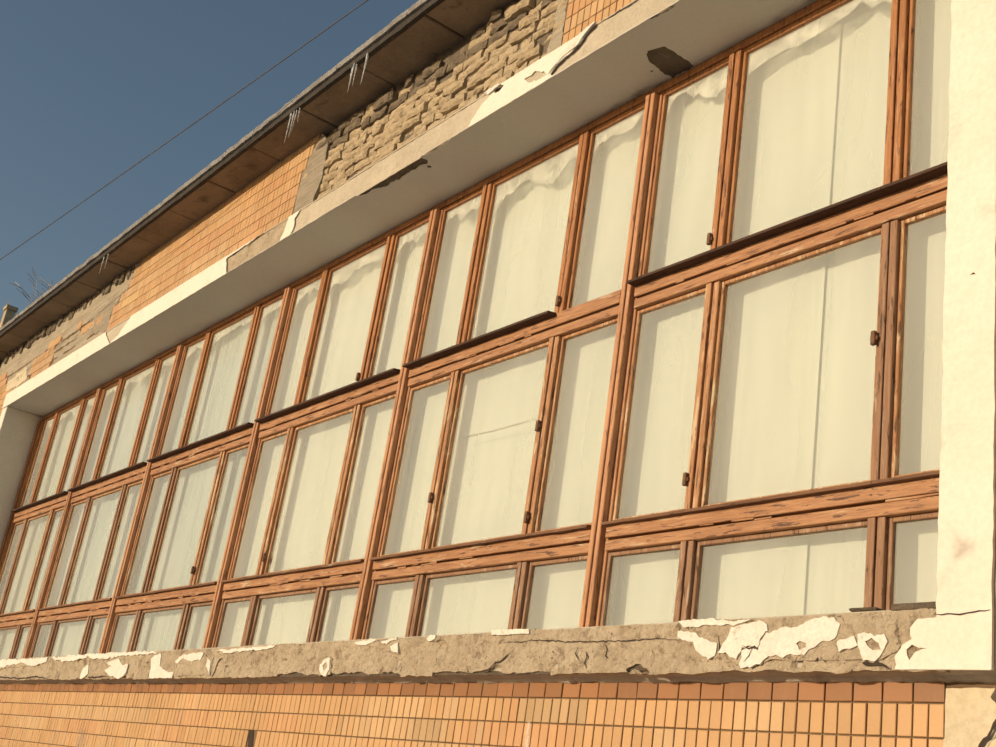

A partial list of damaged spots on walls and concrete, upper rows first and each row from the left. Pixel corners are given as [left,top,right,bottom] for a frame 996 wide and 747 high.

spalling [647,46,694,78]
peeling [227,0,677,272]
peeling [0,261,141,392]
peeling [0,644,277,679]
crack [482,638,679,672]
peeling [676,614,901,669]
peeling [943,688,996,747]